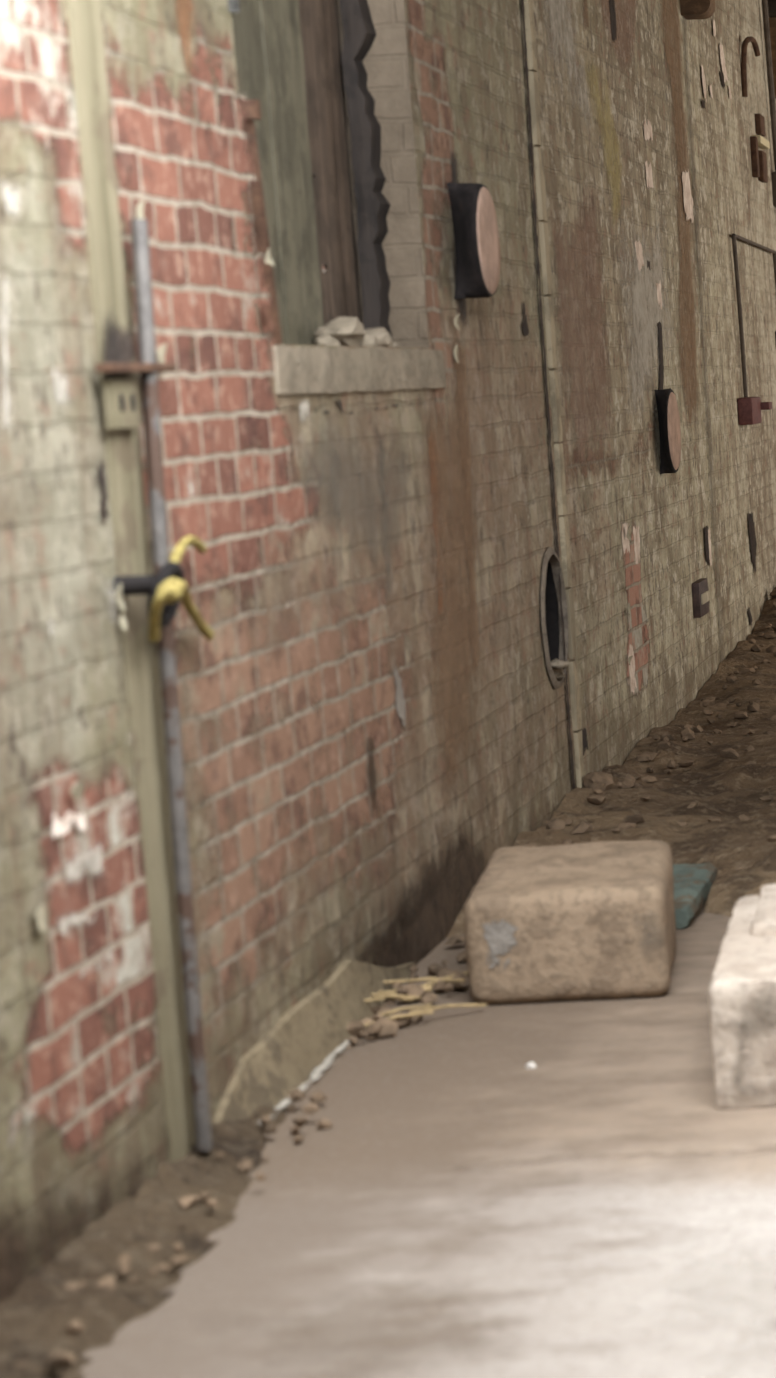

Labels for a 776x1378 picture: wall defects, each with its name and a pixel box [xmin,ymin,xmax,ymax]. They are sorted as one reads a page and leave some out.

flaking render [0,0,88,254]
flaking render [2,280,10,425]
flaking render [53,371,67,403]
flaking render [103,24,413,1034]
spalling [622,521,654,697]
flaking render [8,756,162,1156]